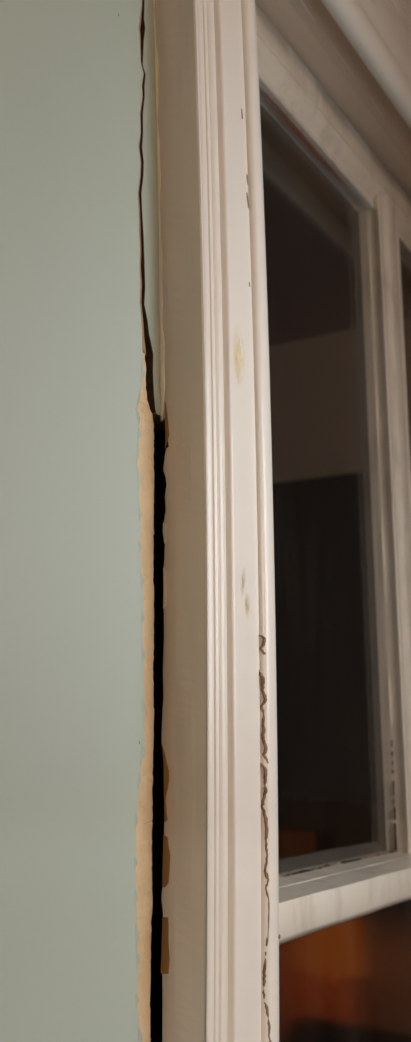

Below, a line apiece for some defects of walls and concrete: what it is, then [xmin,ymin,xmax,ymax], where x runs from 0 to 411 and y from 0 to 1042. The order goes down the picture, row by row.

crack [138,0,156,413]
flaking render [134,353,170,1042]
crack [259,635,272,1042]